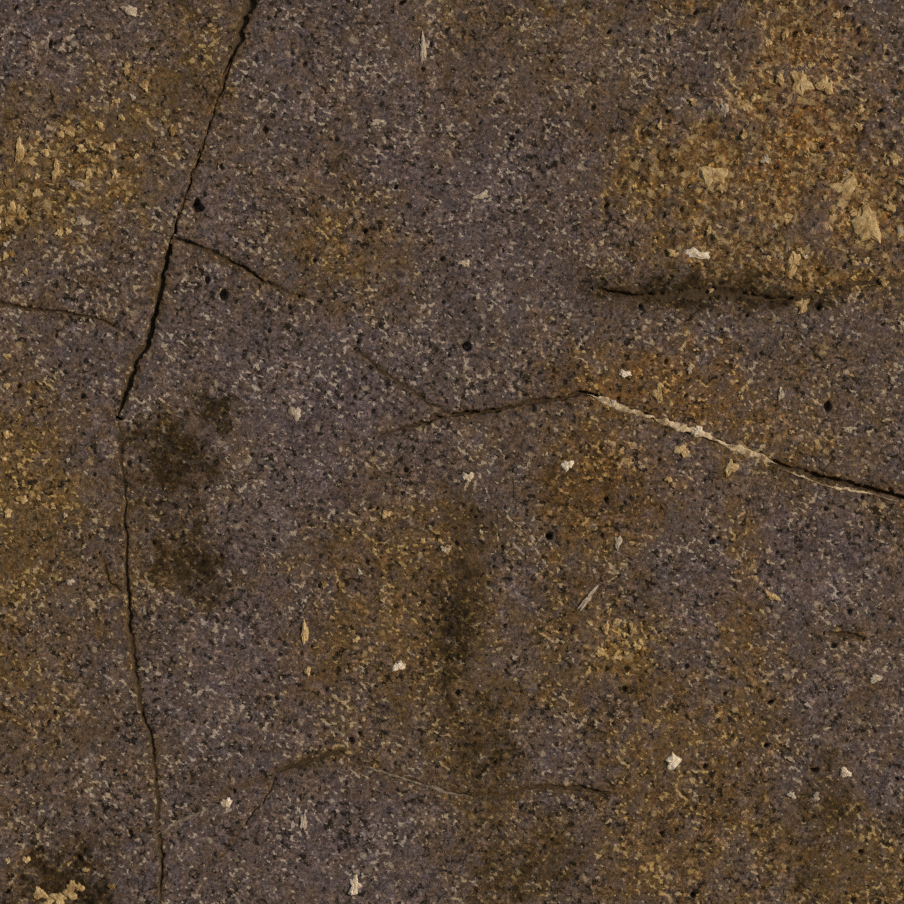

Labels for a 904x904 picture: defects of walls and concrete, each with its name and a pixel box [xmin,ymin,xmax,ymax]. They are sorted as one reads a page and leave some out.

crack [0,0,299,417]
crack [354,347,904,502]
crack [593,275,904,306]
crack [84,419,791,904]